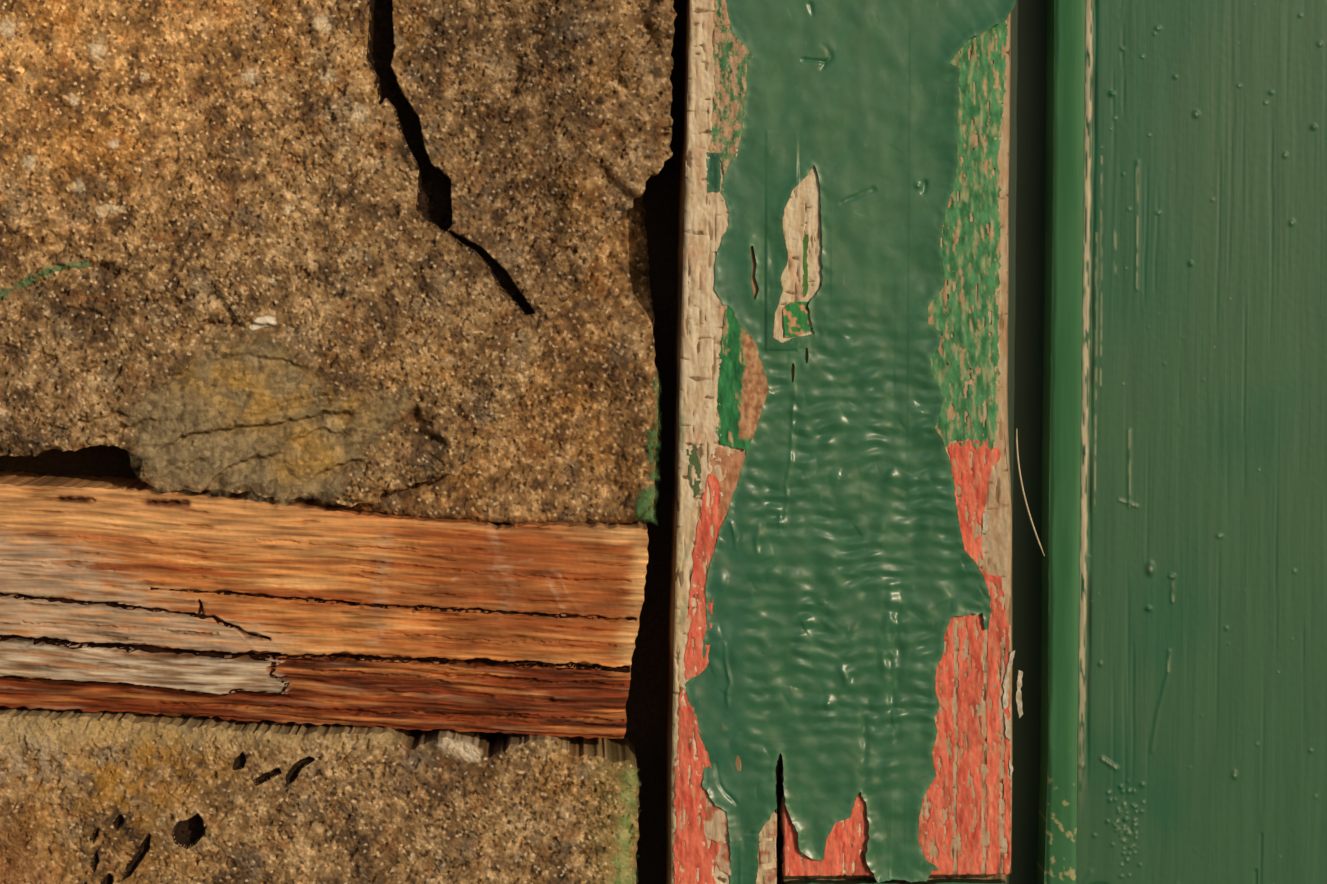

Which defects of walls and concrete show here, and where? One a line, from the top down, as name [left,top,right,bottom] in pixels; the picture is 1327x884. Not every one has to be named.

spalling [130,193,659,525]
crack [367,0,535,315]
peeling [671,0,770,884]
peeling [773,165,823,343]
peeling [918,14,1023,875]
spalling [172,814,205,849]
spalling [233,752,315,786]
crack [0,588,635,696]